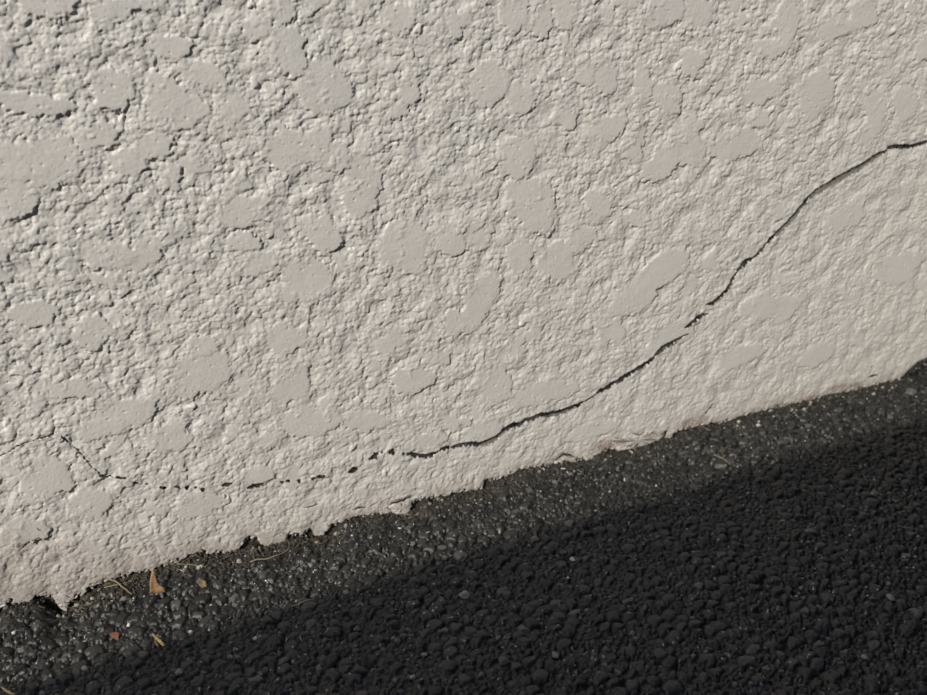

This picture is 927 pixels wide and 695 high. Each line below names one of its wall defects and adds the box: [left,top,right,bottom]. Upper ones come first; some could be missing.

crack [0,433,325,492]
crack [348,140,927,473]